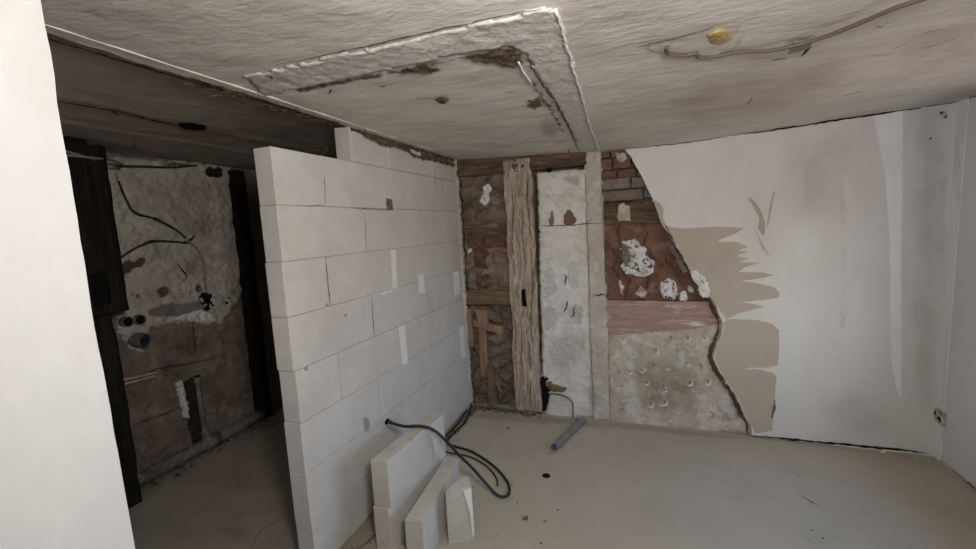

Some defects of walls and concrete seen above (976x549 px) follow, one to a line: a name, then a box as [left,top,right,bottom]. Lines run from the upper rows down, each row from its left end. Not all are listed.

peeling [621,153,779,434]